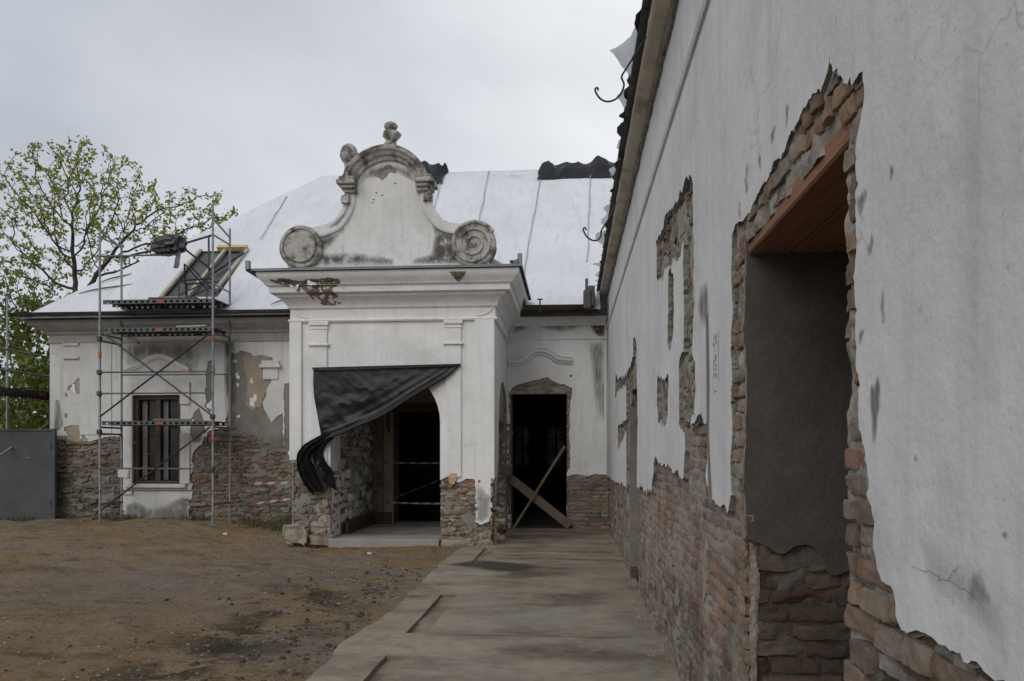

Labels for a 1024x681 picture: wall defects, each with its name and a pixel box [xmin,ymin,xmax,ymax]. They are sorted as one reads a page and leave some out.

spalling [270,277,341,305]
peeling [68,378,80,394]
flaking render [439,75,994,681]
flaking render [57,425,124,519]
flaking render [185,351,384,548]